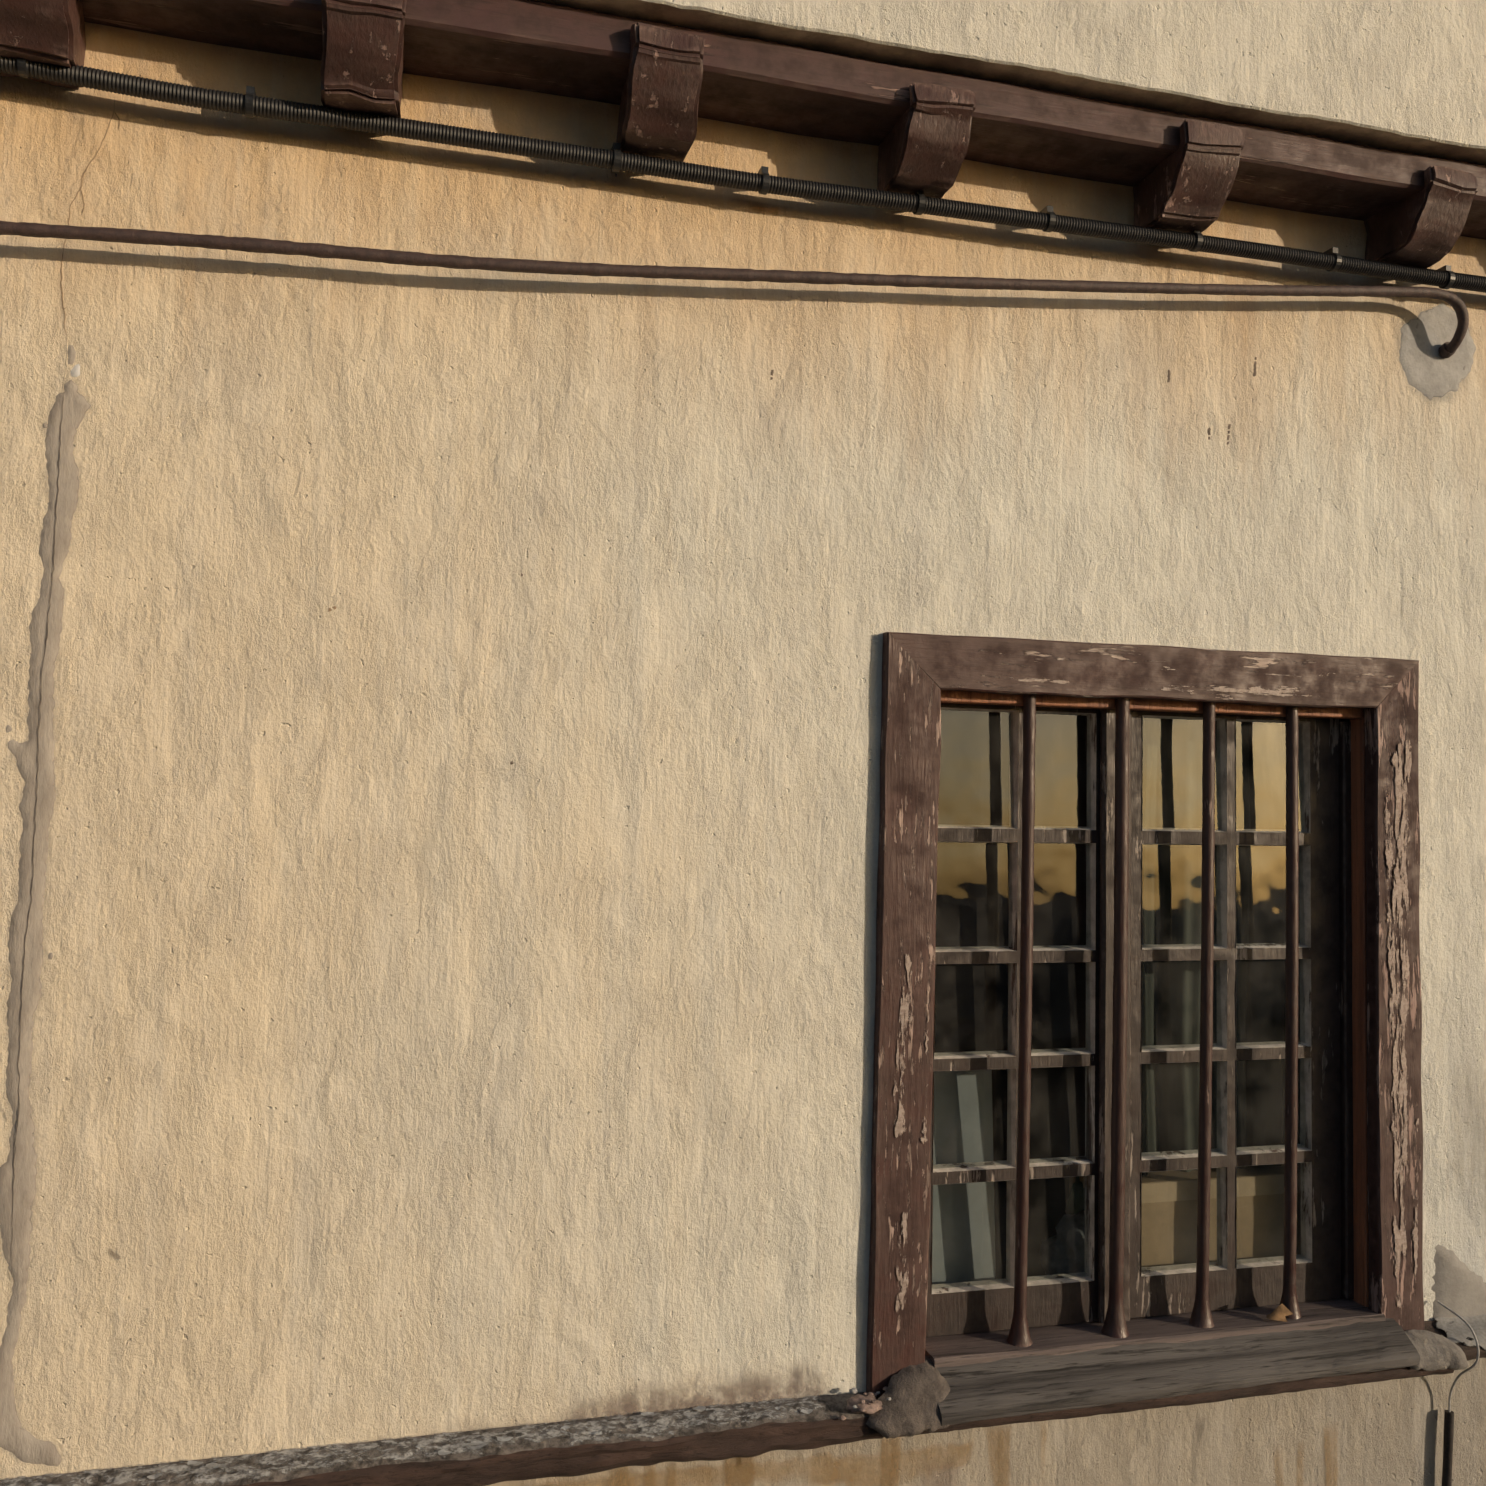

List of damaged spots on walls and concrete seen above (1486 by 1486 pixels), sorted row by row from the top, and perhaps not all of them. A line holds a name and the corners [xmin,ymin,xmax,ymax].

crack [11,100,120,1297]
spalling [1434,1314,1486,1350]